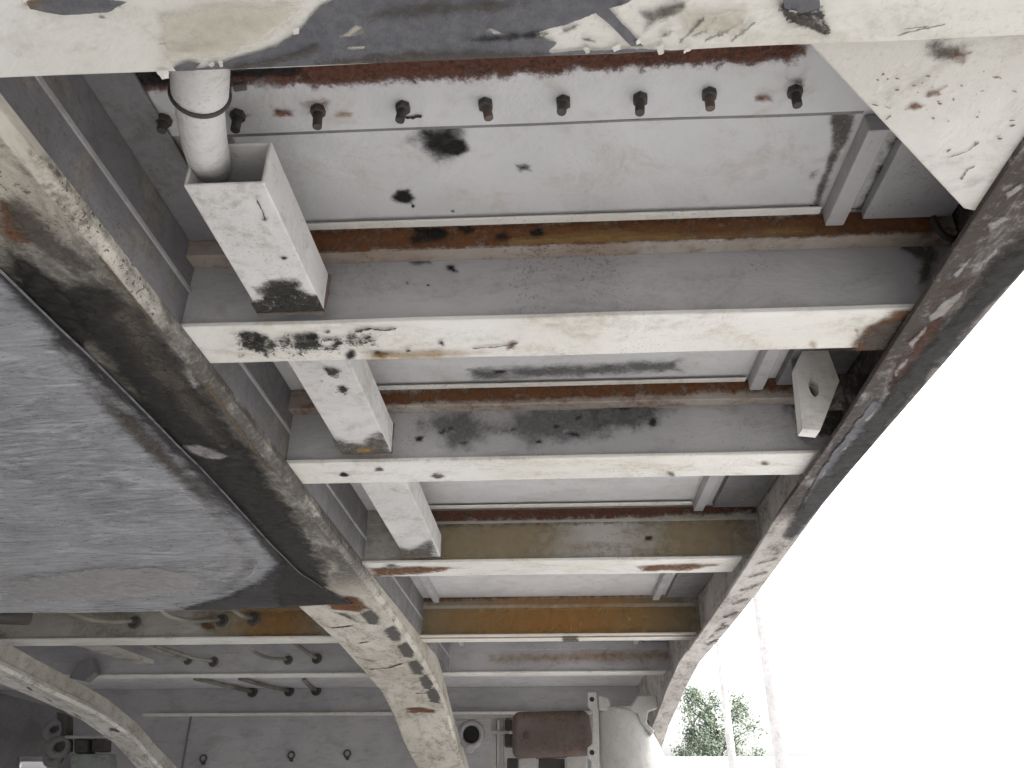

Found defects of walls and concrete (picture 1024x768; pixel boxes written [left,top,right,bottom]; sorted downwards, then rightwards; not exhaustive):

peeling [156,0,691,79]
rust [135,72,170,92]
rust [230,44,806,88]
rust [310,212,935,253]
rust [853,311,910,351]
rust [380,378,793,405]
rust [372,506,757,577]
rust [420,595,700,639]